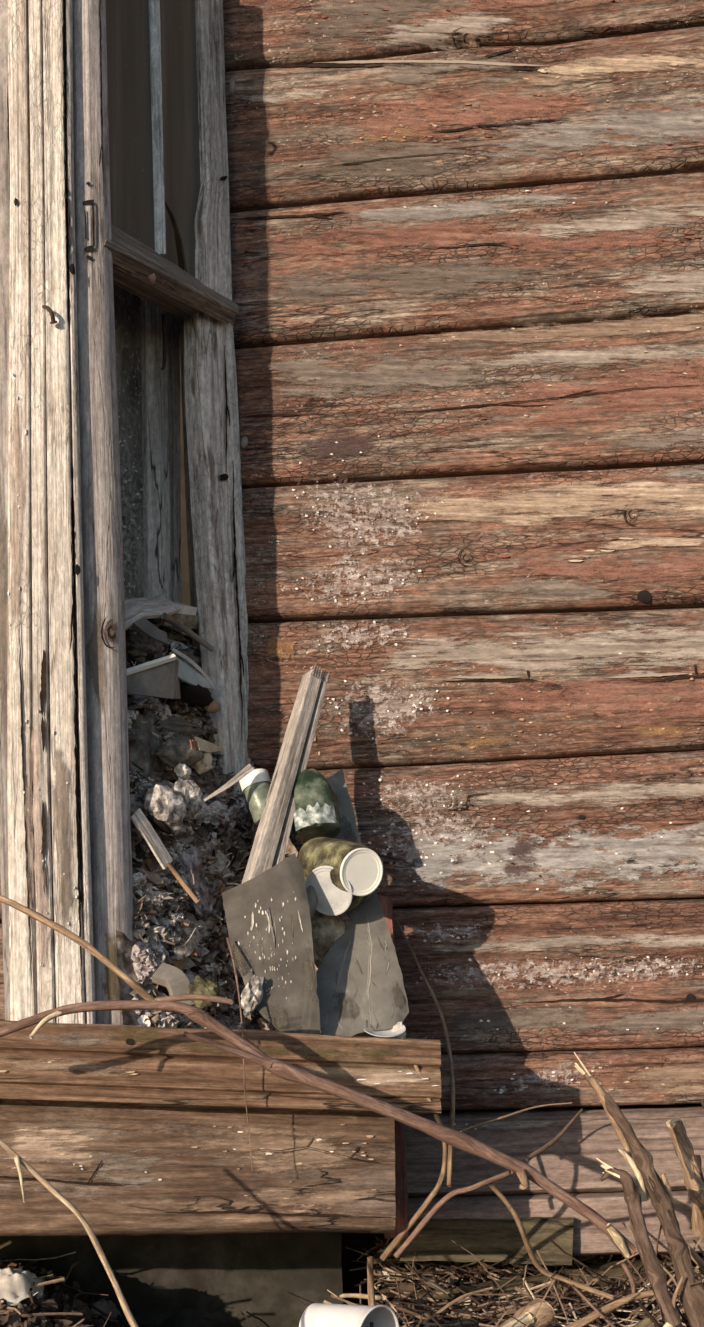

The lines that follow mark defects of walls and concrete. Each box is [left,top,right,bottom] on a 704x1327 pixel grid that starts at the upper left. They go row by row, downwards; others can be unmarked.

peeling [303,0,551,84]
peeling [482,47,704,158]
peeling [350,190,704,249]
peeling [624,260,704,298]
leakage [292,429,444,607]
leakage [317,619,419,652]
leakage [327,678,450,744]
leakage [359,775,544,877]
leakage [407,923,489,944]
leakage [416,956,704,989]